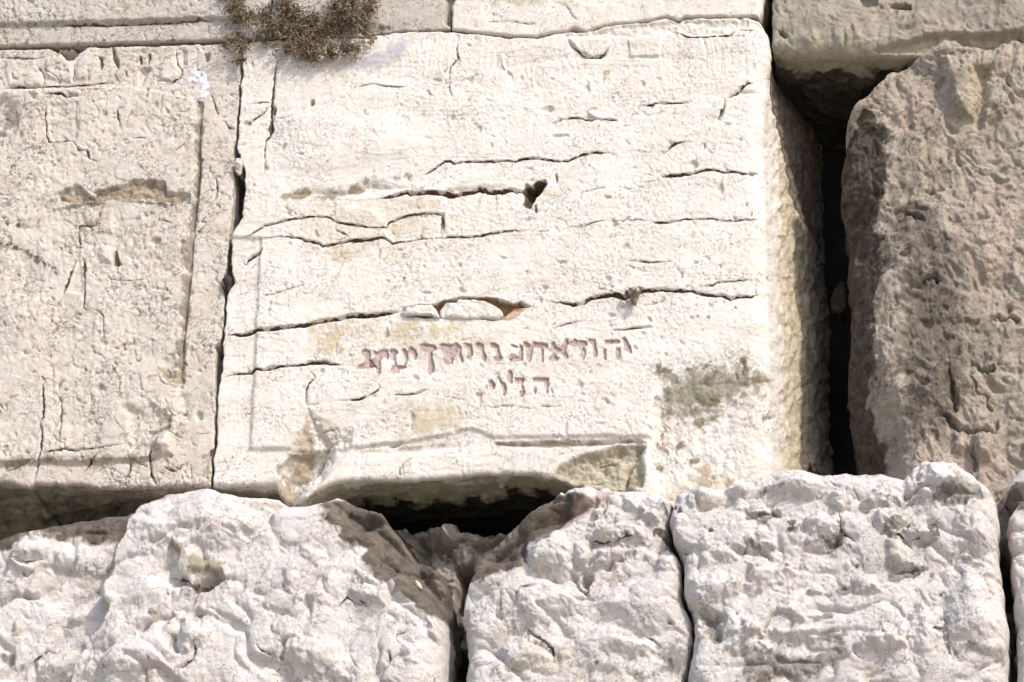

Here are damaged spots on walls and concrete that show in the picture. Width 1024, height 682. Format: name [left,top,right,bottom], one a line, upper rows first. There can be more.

crack [245,102,683,263]
crack [626,169,761,189]
crack [573,218,756,227]
crack [553,261,757,329]
crack [228,311,398,337]
leakage [740,356,771,385]
leakage [677,365,720,426]